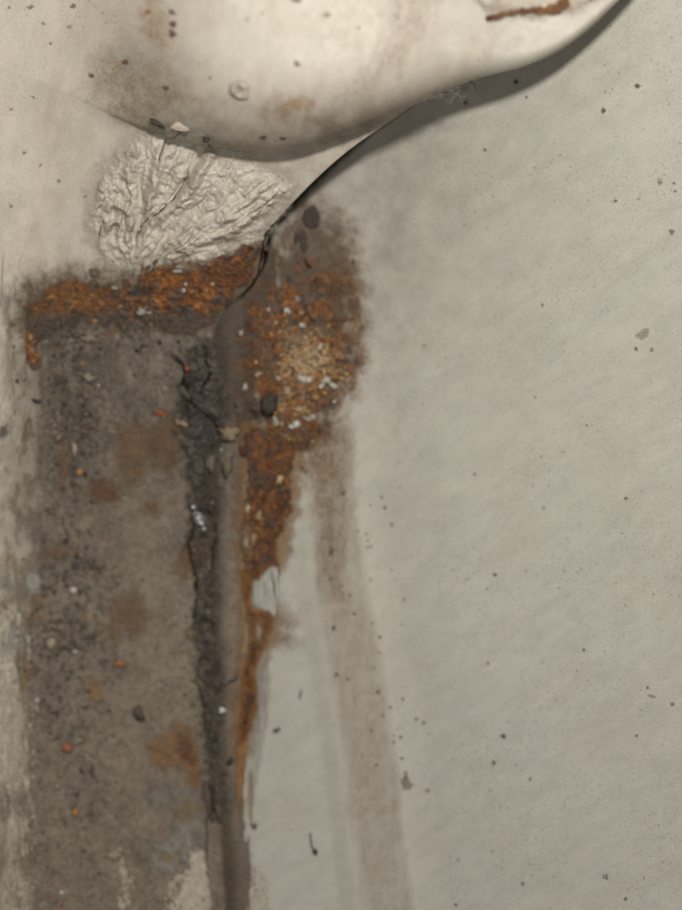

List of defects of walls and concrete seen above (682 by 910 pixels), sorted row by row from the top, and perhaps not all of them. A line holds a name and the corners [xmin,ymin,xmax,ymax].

corrosion [481,0,590,21]
crack [171,345,218,431]
corrosion [9,200,367,816]
crack [187,504,217,634]
crack [194,656,239,745]